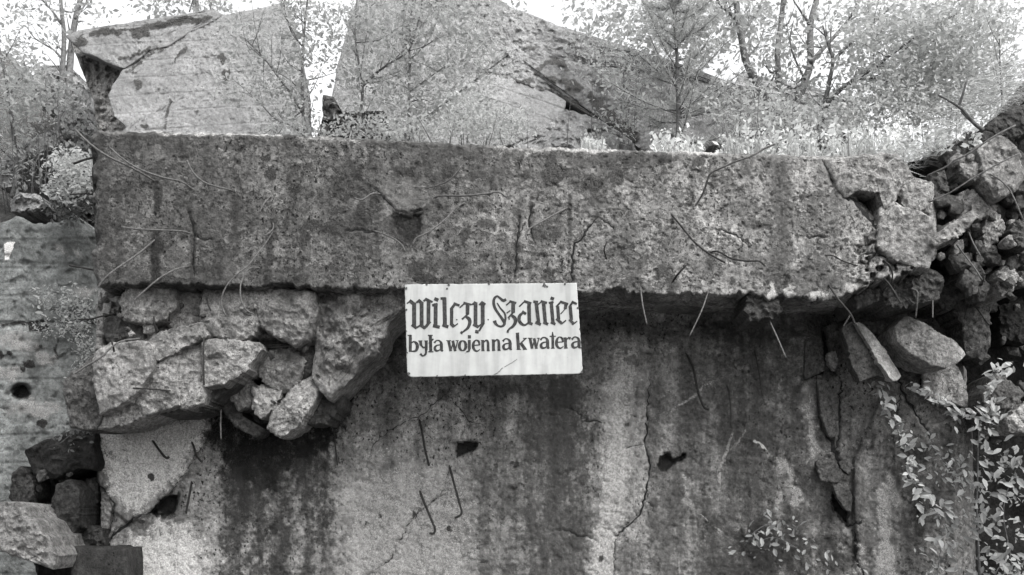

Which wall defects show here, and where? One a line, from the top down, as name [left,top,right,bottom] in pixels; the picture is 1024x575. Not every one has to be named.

spalling [853,322,901,382]
damp [100,419,205,518]
damp [129,451,335,575]
spalling [456,441,479,458]
damp [492,338,636,575]
crack [558,377,654,575]
spalling [657,453,687,472]
spalling [831,491,847,526]